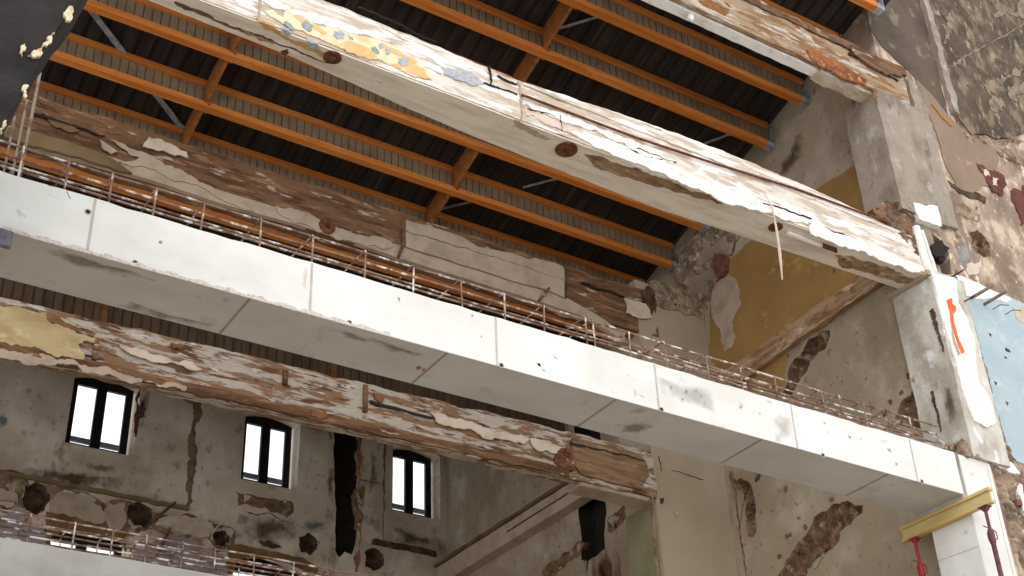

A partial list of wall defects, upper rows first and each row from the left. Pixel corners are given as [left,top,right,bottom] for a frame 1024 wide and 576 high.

crack [483,66,562,131]
peeling [514,103,921,284]
spalling [656,226,741,351]
peeling [134,390,146,437]
spalling [782,330,830,397]
spalling [0,399,236,552]
spalling [237,492,294,518]
spalling [350,437,364,573]
crack [731,475,749,575]
spalling [777,497,863,576]